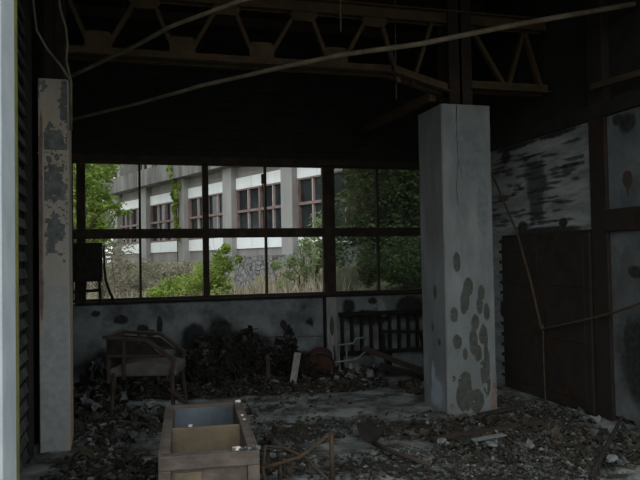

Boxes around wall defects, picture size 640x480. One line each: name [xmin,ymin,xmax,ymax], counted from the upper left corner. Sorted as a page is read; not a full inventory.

peeling [43,150,68,275]
water stain [447,116,584,376]
peeling [449,247,499,415]